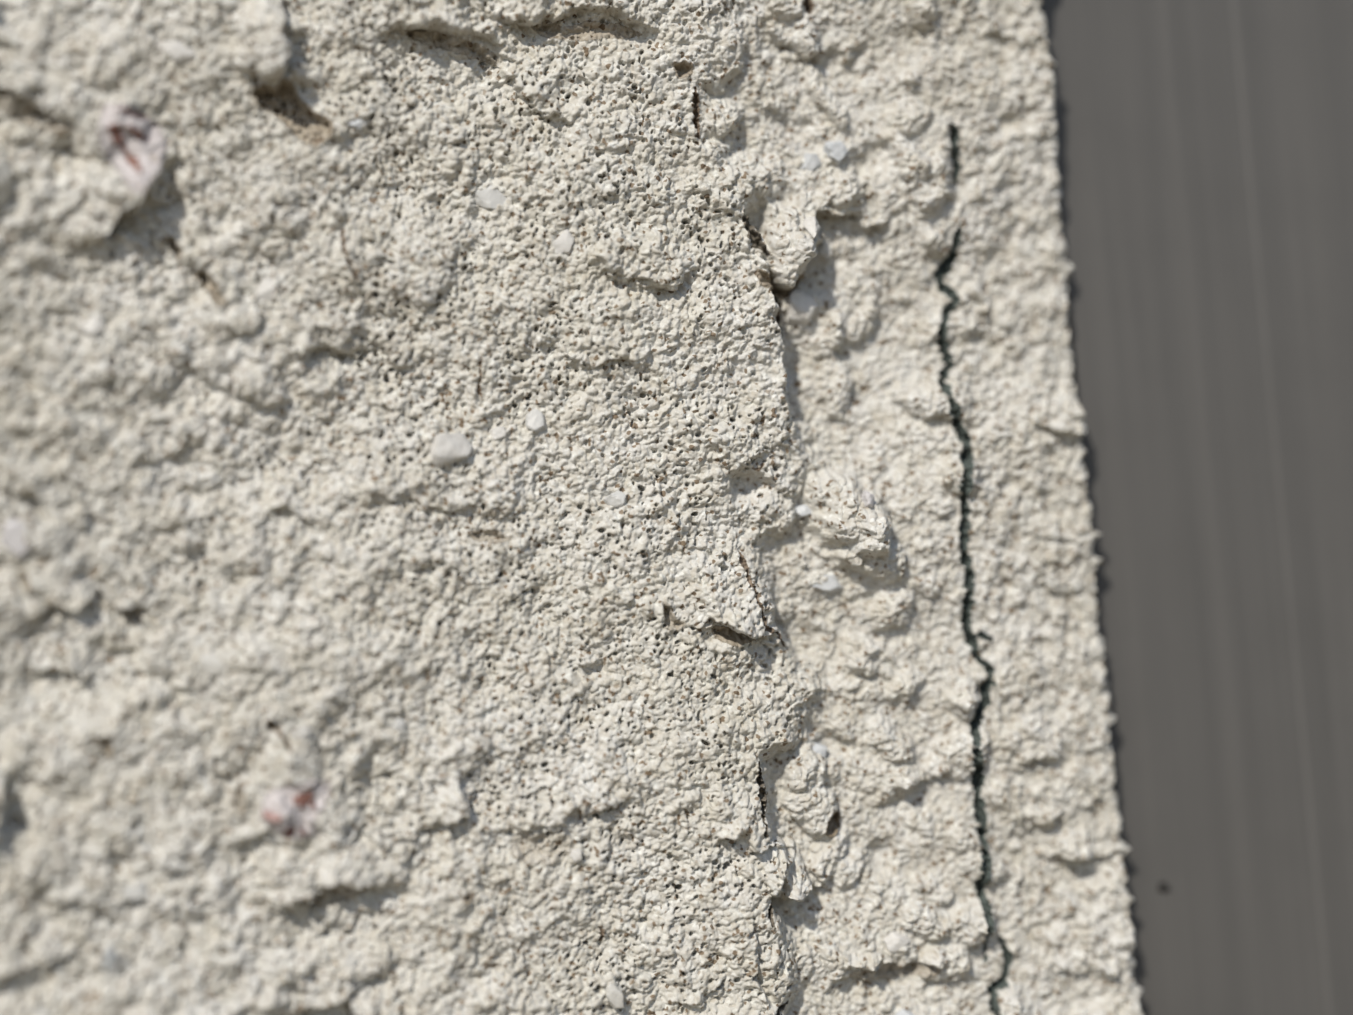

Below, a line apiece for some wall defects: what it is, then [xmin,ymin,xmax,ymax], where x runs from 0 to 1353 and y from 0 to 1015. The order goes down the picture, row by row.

crack [949,122,961,186]
crack [932,222,1014,1015]